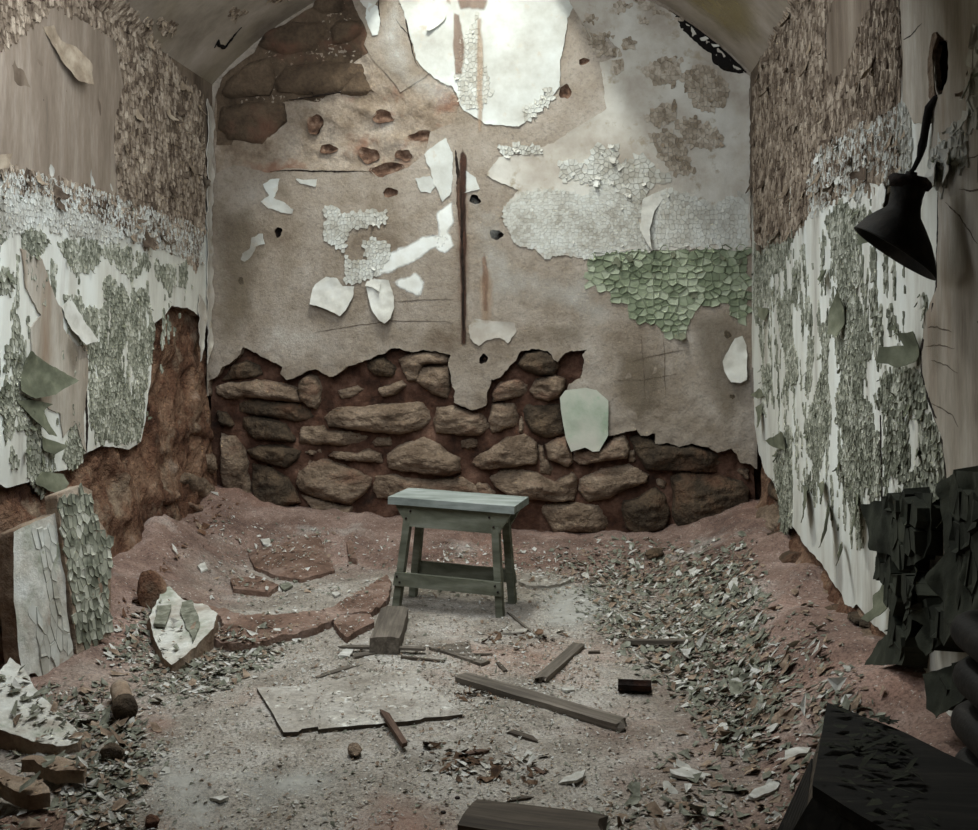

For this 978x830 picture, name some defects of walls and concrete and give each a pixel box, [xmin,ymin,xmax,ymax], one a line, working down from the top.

flaking render [559,84,572,99]
peeling [0,0,461,675]
peeling [579,0,978,565]
flaking render [210,348,755,533]
peeling [861,585,888,622]